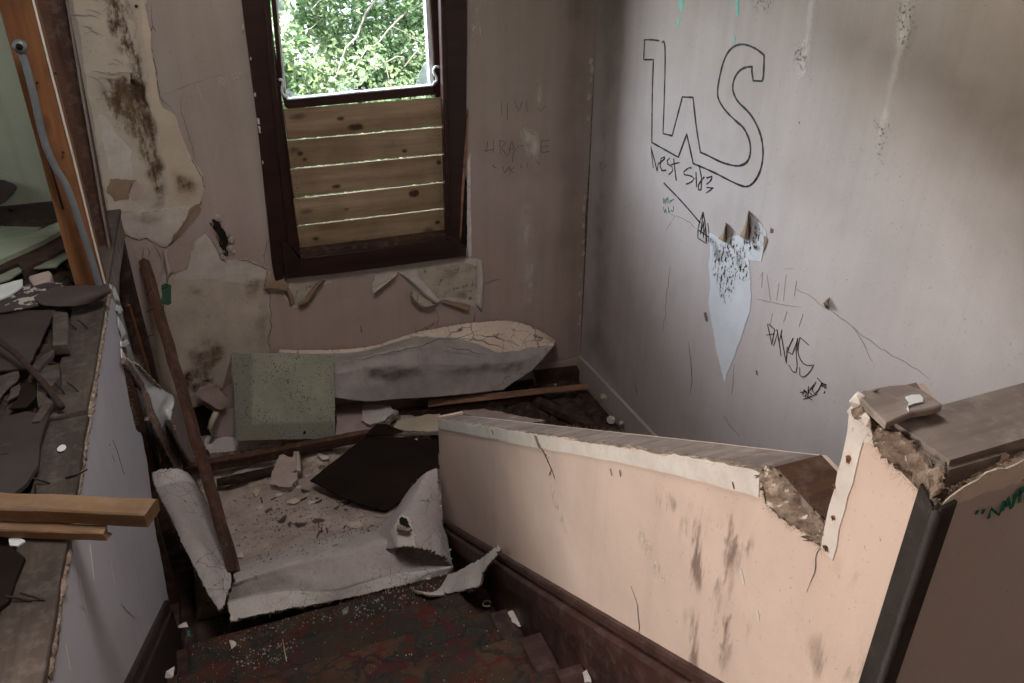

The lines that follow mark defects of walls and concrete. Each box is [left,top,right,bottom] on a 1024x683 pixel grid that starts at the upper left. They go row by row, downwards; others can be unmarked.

peeling [73,0,205,248]
peeling [150,215,272,436]
peeling [286,155,484,313]
peeling [704,210,773,383]
crack [534,435,555,479]
flaking render [754,465,829,558]
flaking render [847,389,950,512]